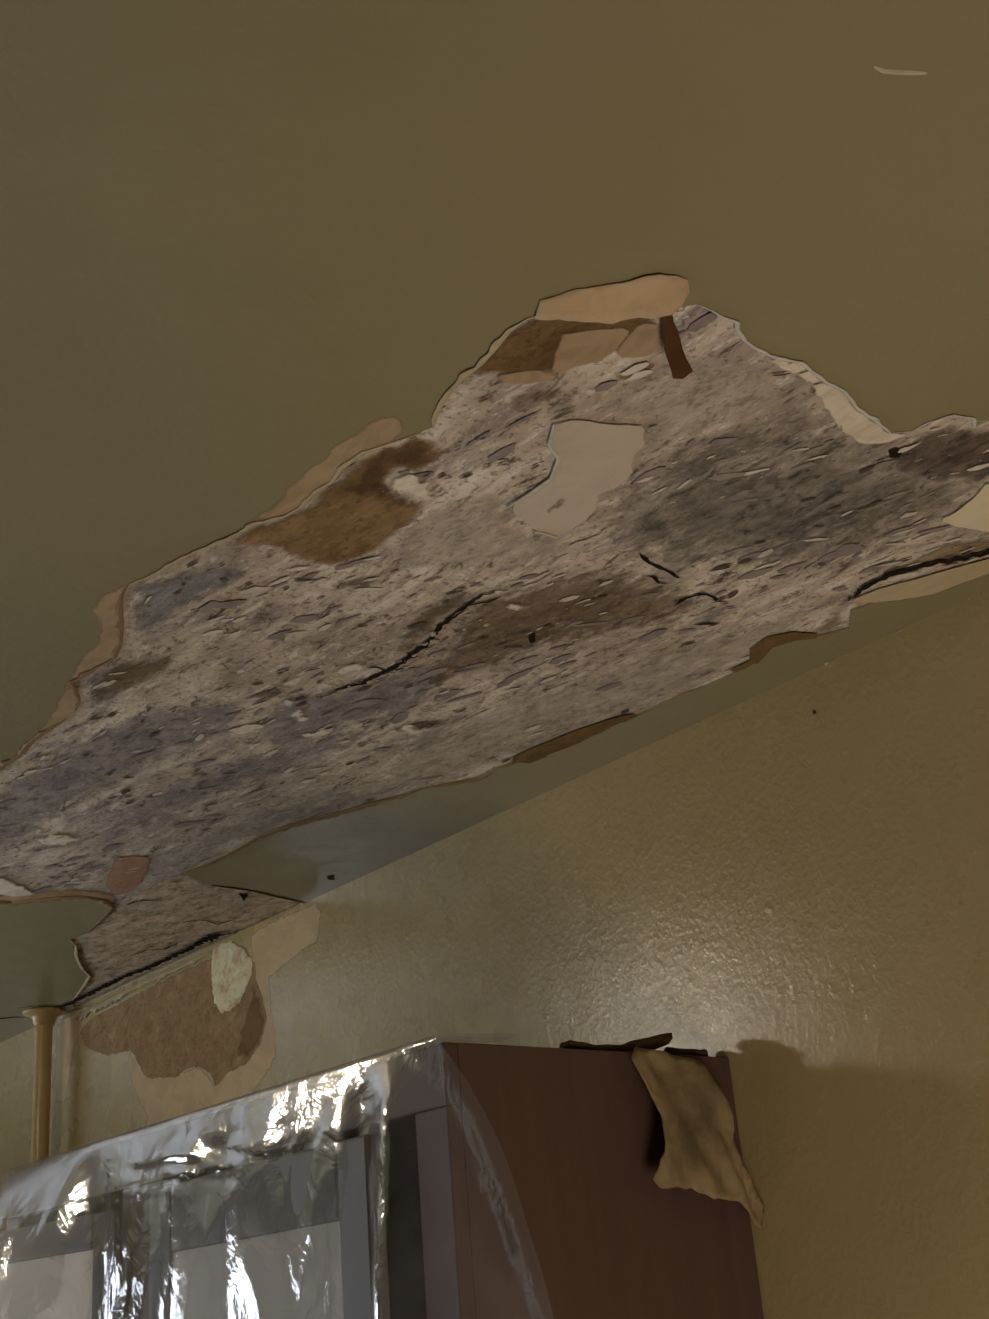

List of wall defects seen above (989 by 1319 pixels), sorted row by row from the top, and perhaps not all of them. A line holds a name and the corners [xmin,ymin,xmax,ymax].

damp [477,318,650,376]
damp [237,439,437,565]
damp [605,408,989,565]
damp [93,658,169,699]
crack [322,590,508,697]
flaking render [0,274,989,1134]
damp [401,570,694,687]
damp [513,715,636,764]
damp [730,632,817,672]
crack [846,549,989,601]